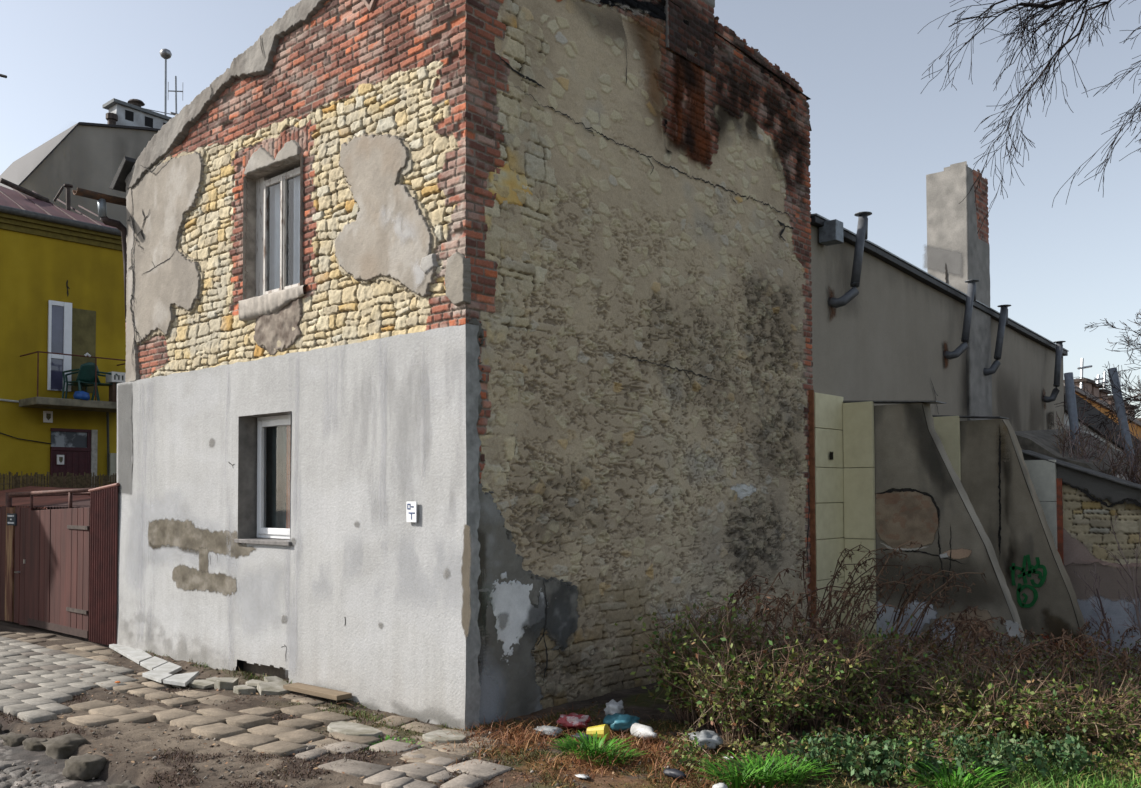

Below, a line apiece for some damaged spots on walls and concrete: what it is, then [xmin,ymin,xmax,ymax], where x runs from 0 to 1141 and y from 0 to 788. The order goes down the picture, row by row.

flaking render [244,140,301,178]
spalling [488,161,533,206]
flaking render [132,149,207,345]
flaking render [334,132,472,306]
spalling [253,296,304,355]
spalling [875,488,972,559]
spalling [1064,483,1141,508]